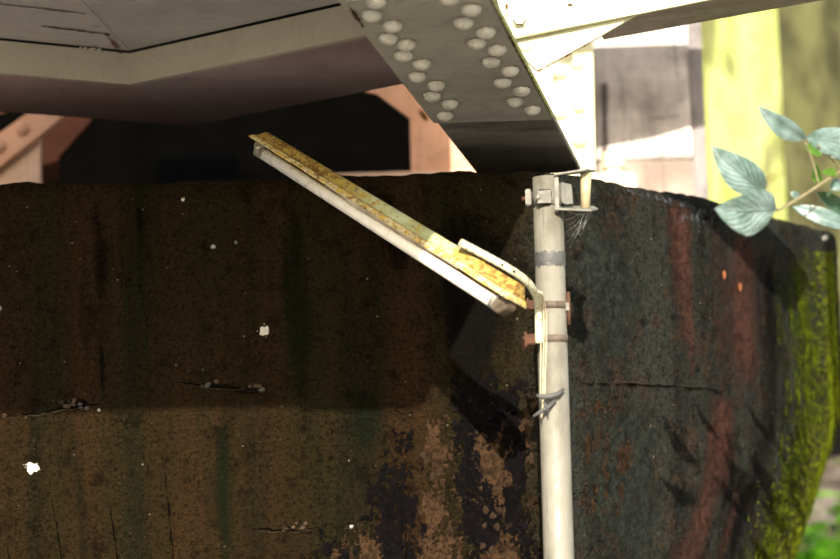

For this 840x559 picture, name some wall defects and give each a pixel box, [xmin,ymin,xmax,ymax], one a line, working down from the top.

corrosion [668,205,693,354]
corrosion [729,237,756,380]
crack [1,399,102,419]
crack [579,381,728,394]